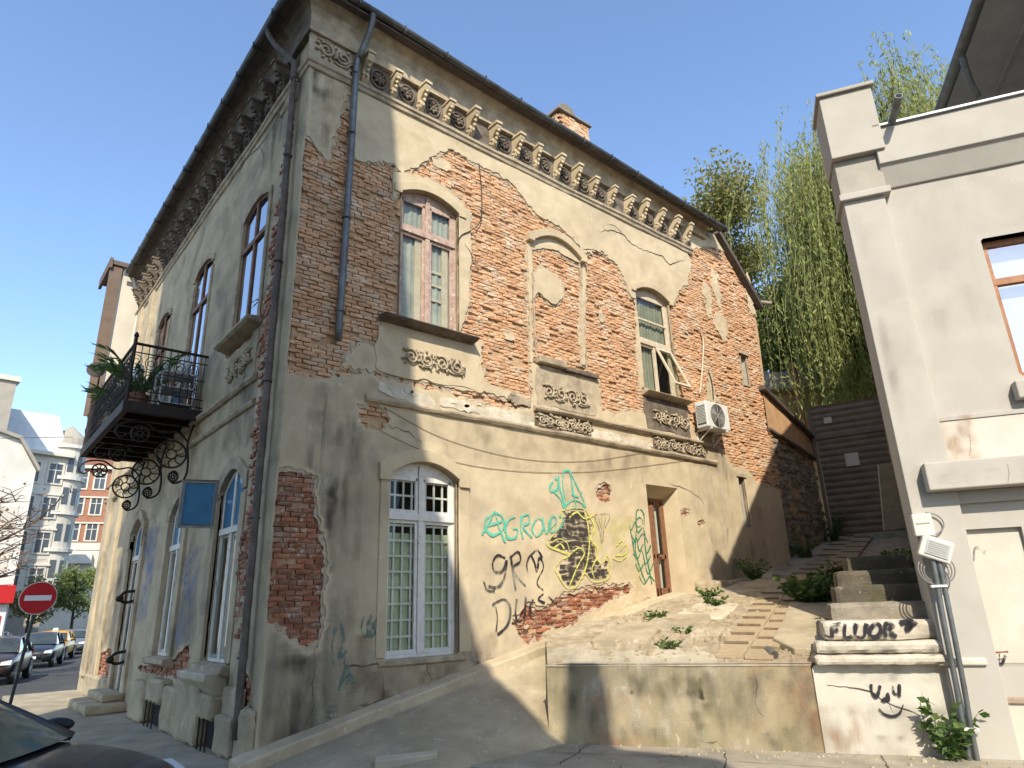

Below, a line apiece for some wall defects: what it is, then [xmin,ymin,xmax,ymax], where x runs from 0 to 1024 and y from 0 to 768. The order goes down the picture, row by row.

crack [583,224,683,265]
flaking render [224,103,655,655]
flaking render [670,248,780,488]
flaking render [98,649,112,678]
flaking render [139,646,190,678]